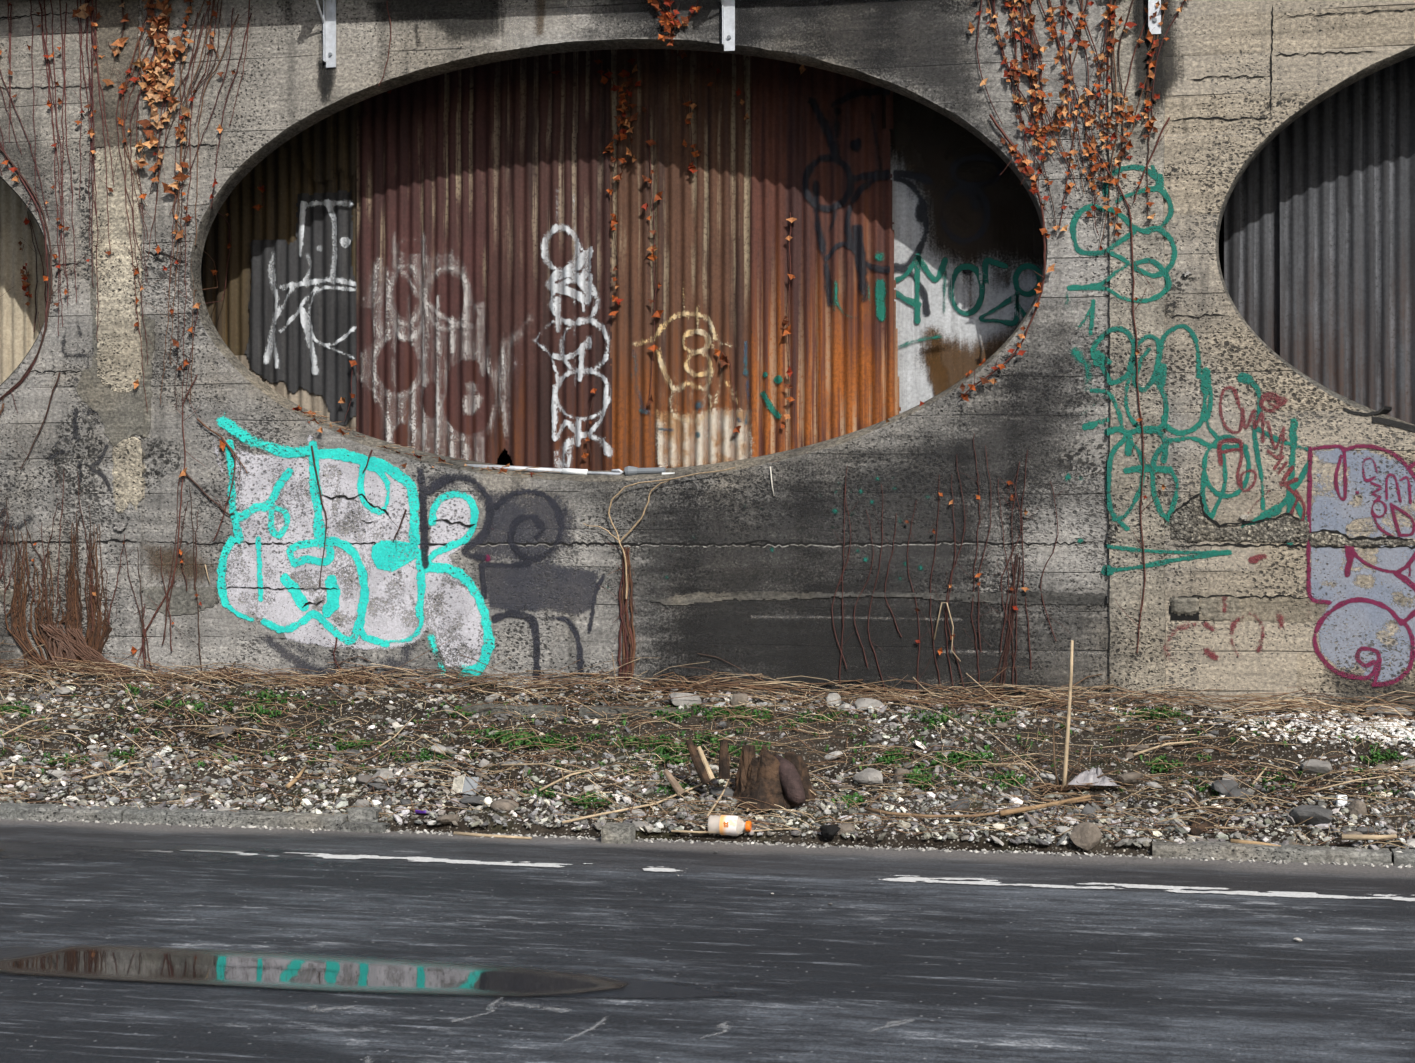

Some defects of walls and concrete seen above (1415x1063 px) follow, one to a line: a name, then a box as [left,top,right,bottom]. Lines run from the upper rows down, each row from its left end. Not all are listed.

rust [760,372,783,419]
leakage [583,323,1098,701]
crack [1173,542,1415,550]
crack [1170,592,1309,600]